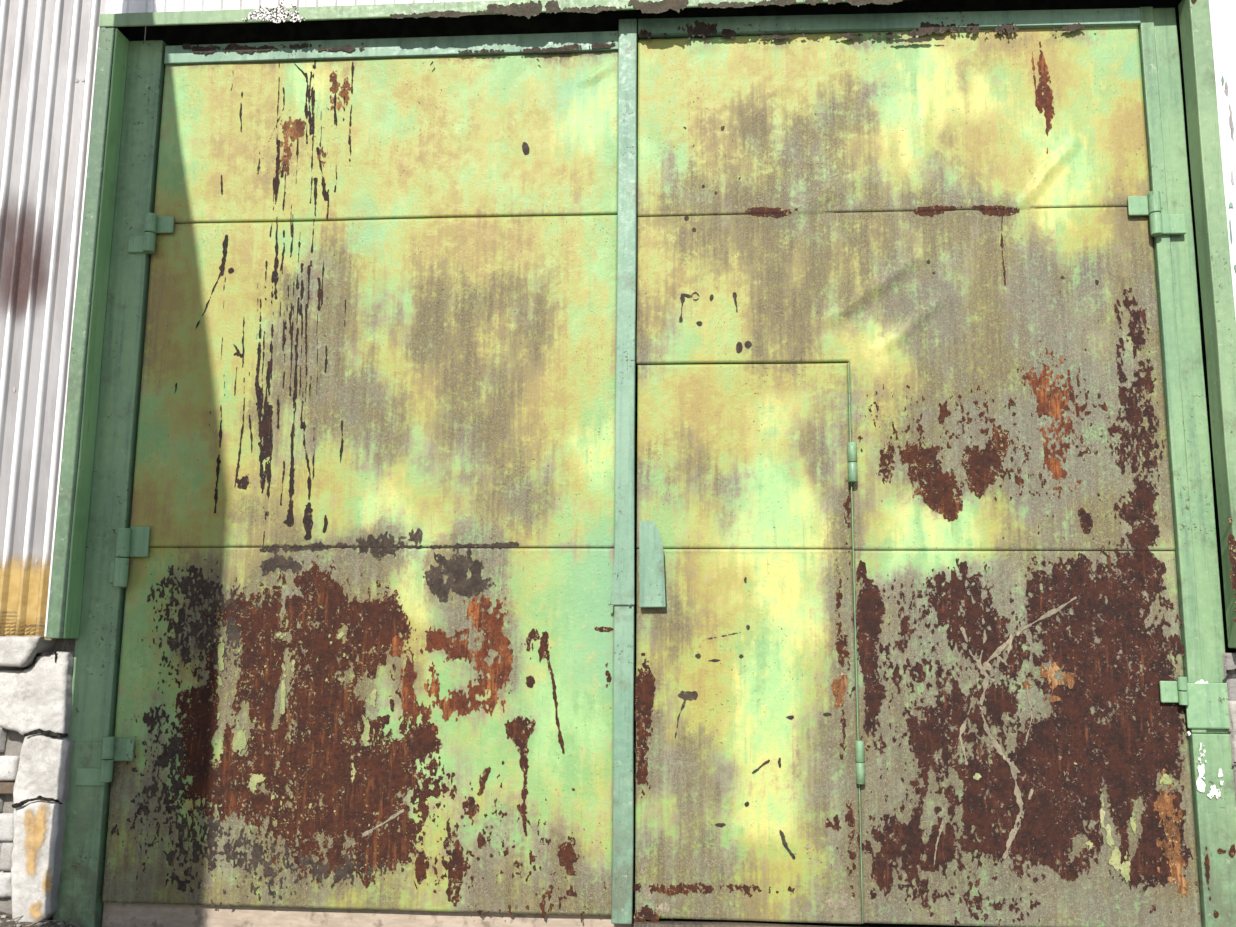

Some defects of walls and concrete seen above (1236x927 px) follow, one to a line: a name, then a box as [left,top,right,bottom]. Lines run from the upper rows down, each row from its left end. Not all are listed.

corrosion [390,0,902,19]
corrosion [328,70,352,111]
corrosion [1031,41,1055,154]
corrosion [279,115,306,176]
corrosion [849,286,1198,927]
crack [20,651,57,670]
crack [24,729,68,738]
corrosion [111,555,600,922]
crack [12,795,62,808]
corrosion [632,882,795,924]